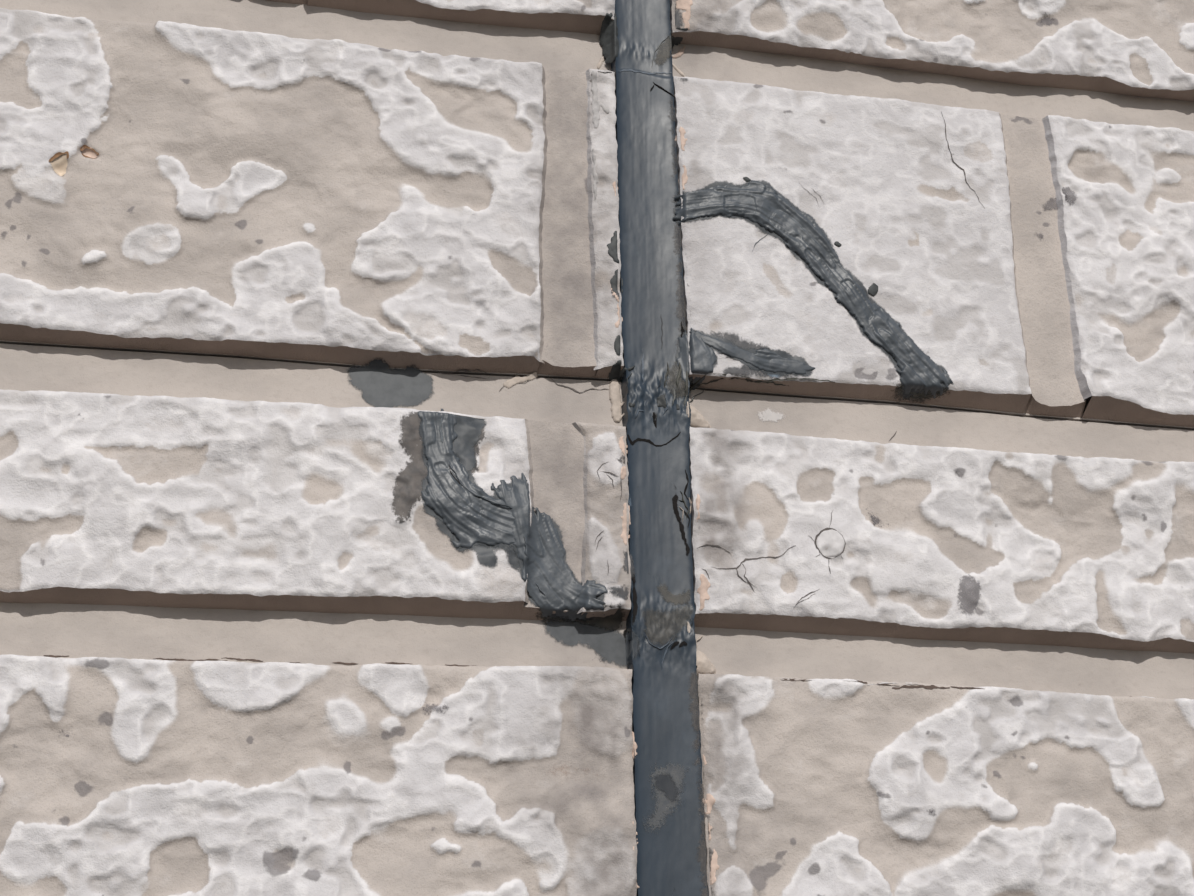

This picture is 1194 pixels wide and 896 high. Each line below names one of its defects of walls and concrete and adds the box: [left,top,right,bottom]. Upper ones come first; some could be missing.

peeling [676,0,693,30]
spalling [49,145,99,176]
crack [941,112,980,202]
crack [698,511,846,606]
peeling [857,680,983,689]
peeling [702,794,719,885]